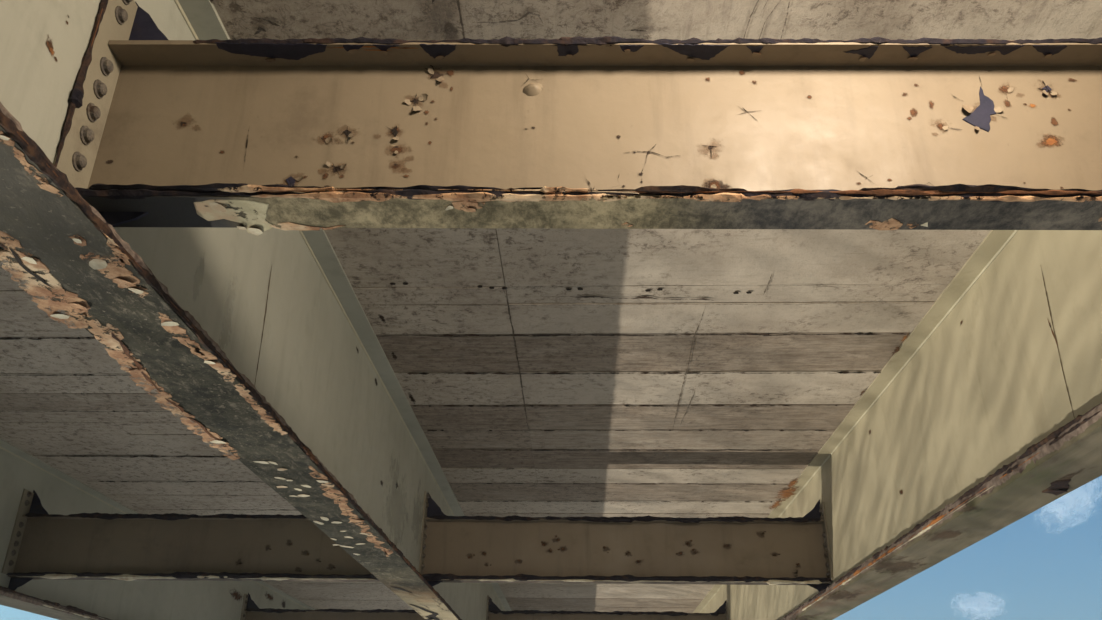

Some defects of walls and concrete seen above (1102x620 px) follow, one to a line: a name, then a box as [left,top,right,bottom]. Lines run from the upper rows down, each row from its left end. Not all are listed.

peeling [215,42,327,62]
peeling [659,43,730,63]
peeling [945,45,1067,58]
peeling [937,77,1006,132]
corrosion [1041,117,1060,146]
peeling [194,176,799,236]
corrosion [75,180,1102,201]
corrosion [0,0,833,620]
peeling [0,231,240,460]
peeling [159,313,288,435]
peeling [253,461,393,557]
corrosion [780,403,1102,620]